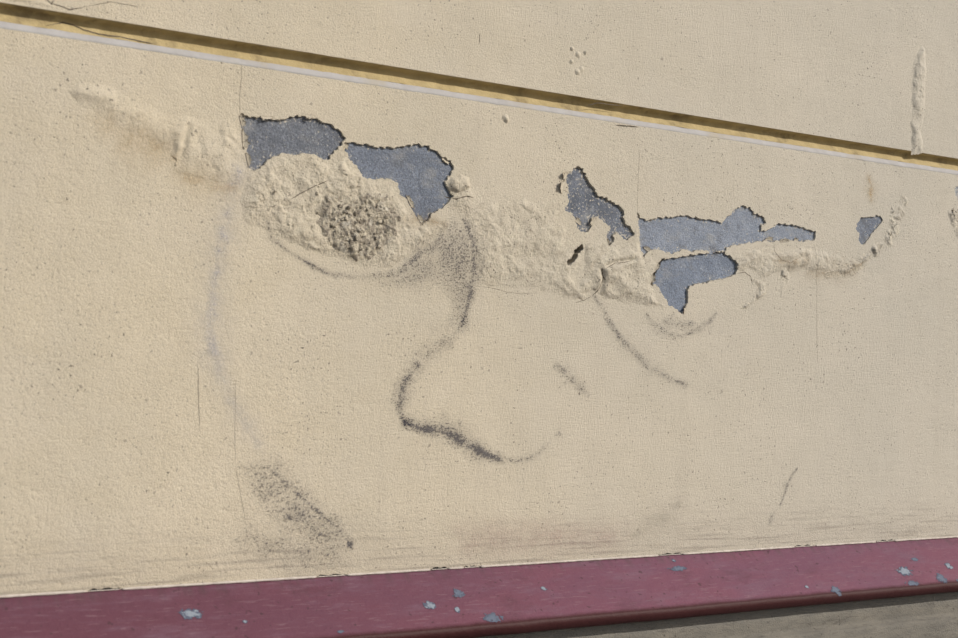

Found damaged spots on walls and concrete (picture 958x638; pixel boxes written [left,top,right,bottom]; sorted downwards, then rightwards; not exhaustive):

crack [46,0,154,44]
peeling [239,113,452,262]
peeling [560,167,814,314]
peeling [855,216,882,245]